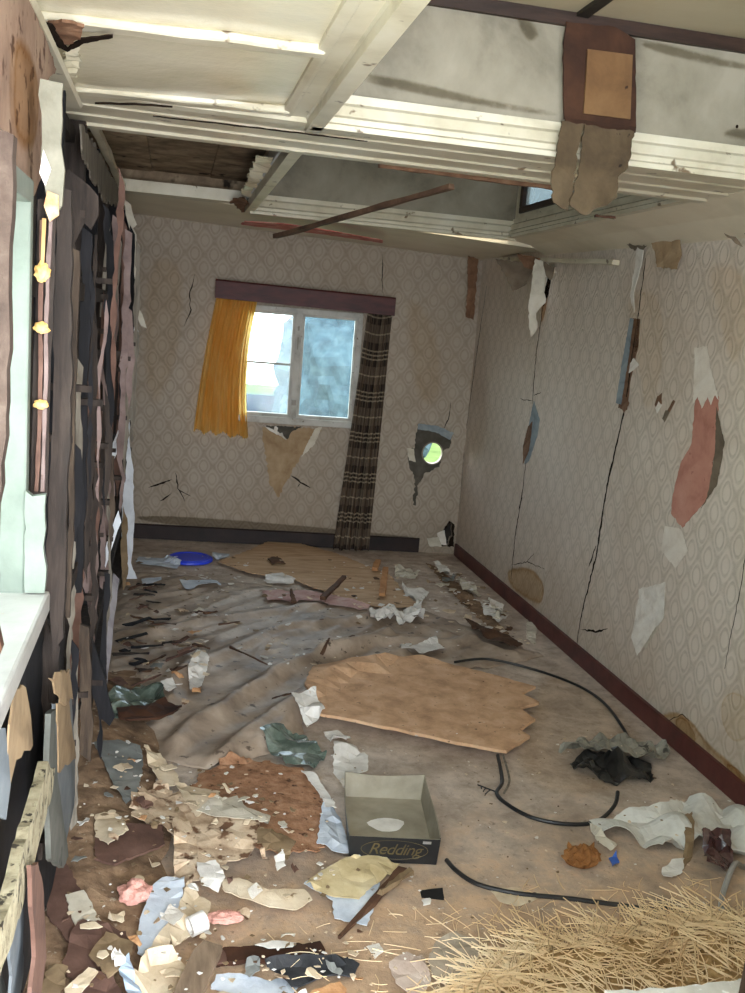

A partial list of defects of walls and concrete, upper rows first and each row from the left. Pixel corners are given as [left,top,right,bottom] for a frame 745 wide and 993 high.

peeling [39,150,51,186]
spalling [30,199,56,496]
crack [522,308,543,402]
peeling [693,346,718,408]
crack [577,258,646,642]
crack [511,464,544,575]
peeling [631,582,666,655]
crack [724,560,745,669]